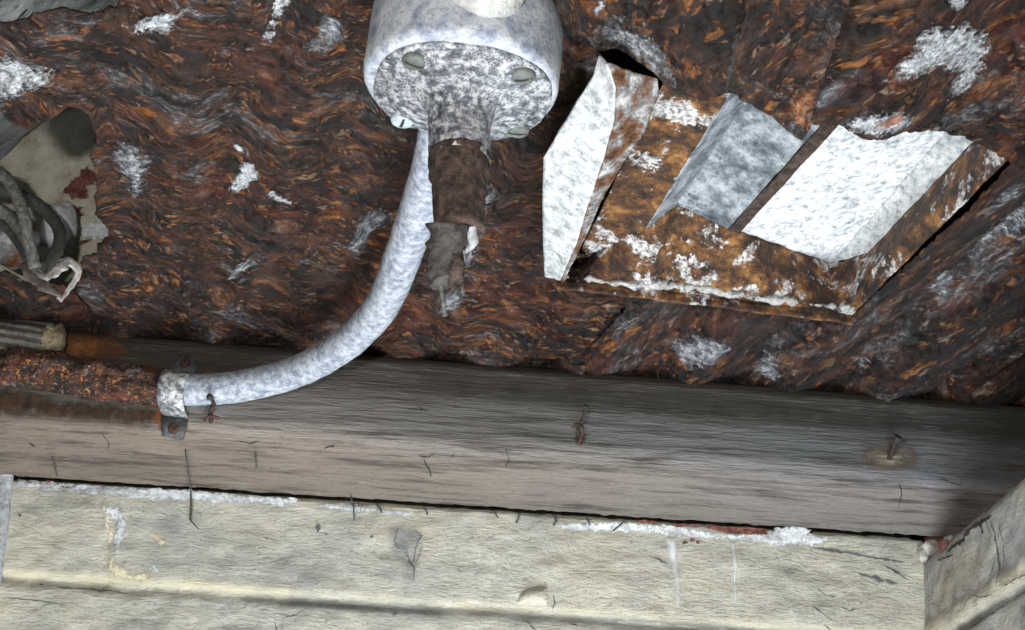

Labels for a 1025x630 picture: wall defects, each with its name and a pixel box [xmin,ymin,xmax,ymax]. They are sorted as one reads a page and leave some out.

peeling [606,24,676,87]
peeling [883,0,991,101]
peeling [788,93,813,126]
peeling [846,111,912,138]
peeling [64,166,108,246]
peeling [967,182,1025,260]
peeling [19,257,82,302]
peeling [924,270,953,298]
corrosion [65,335,119,358]
corrosion [0,388,161,428]
crack [808,515,1025,630]